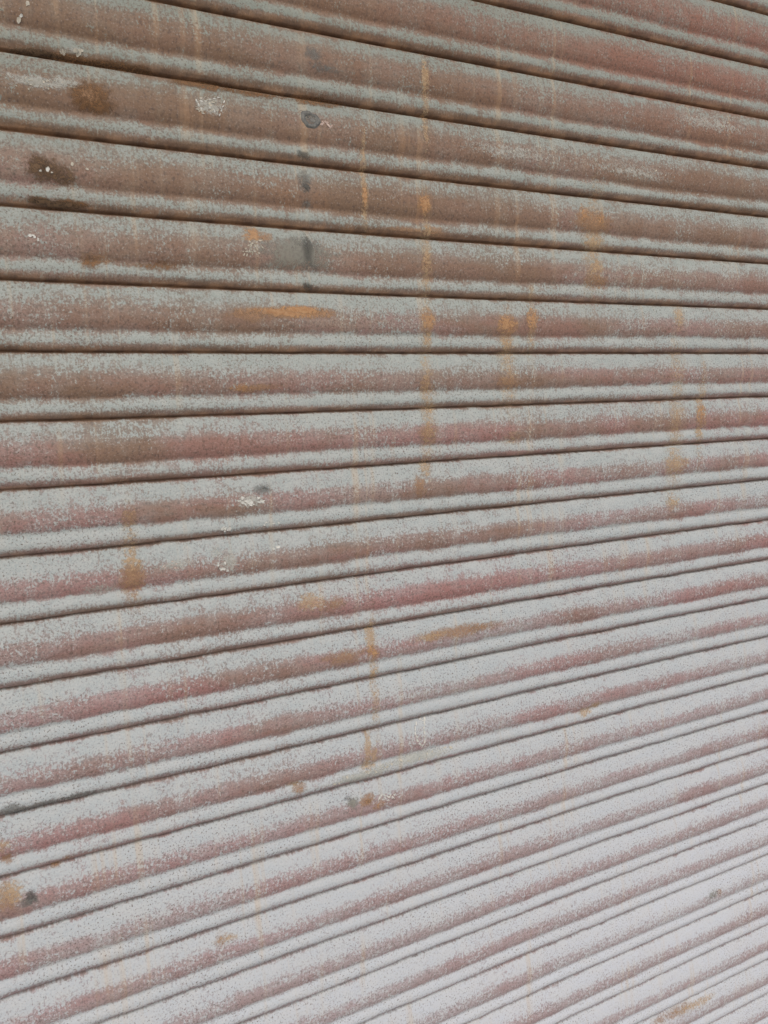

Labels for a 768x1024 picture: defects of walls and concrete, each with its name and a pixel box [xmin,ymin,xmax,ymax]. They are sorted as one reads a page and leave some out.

rust [69,82,117,114]
rust [28,155,75,184]
rust [234,305,335,322]